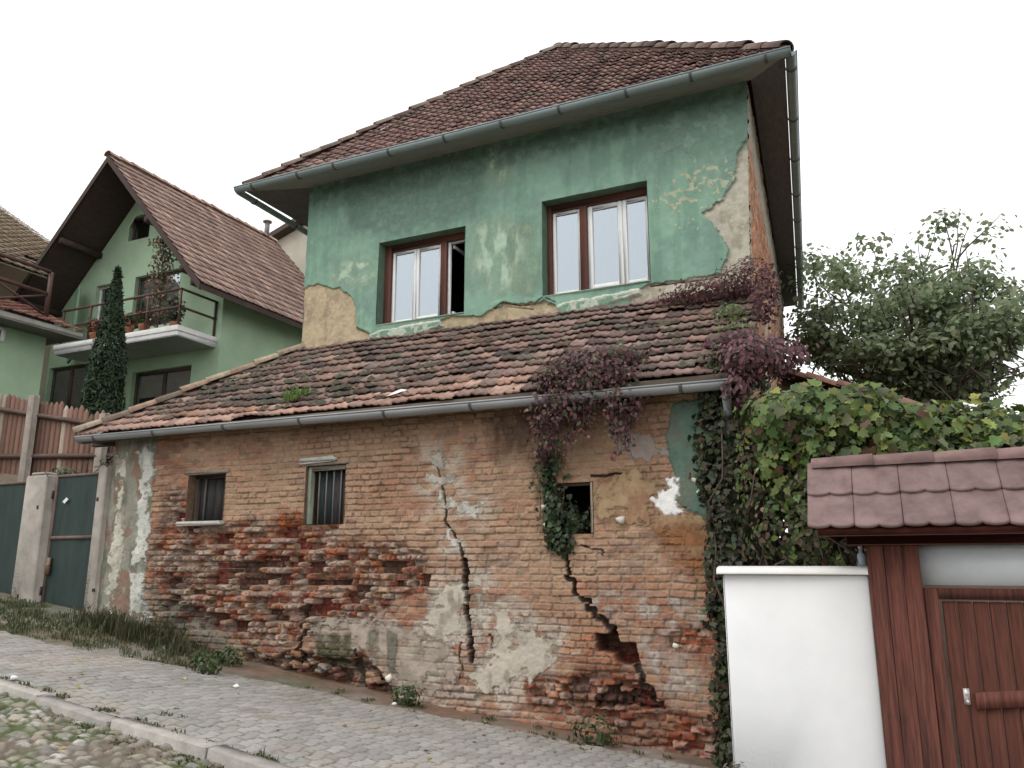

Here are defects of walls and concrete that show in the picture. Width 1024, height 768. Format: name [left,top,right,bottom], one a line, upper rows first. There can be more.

flaking render [630,139,750,306]
flaking render [300,284,371,352]
flaking render [423,297,561,338]
flaking render [650,477,683,516]
spalling [104,445,431,649]
crack [437,467,493,681]
crack [564,538,618,630]
crack [634,660,663,706]